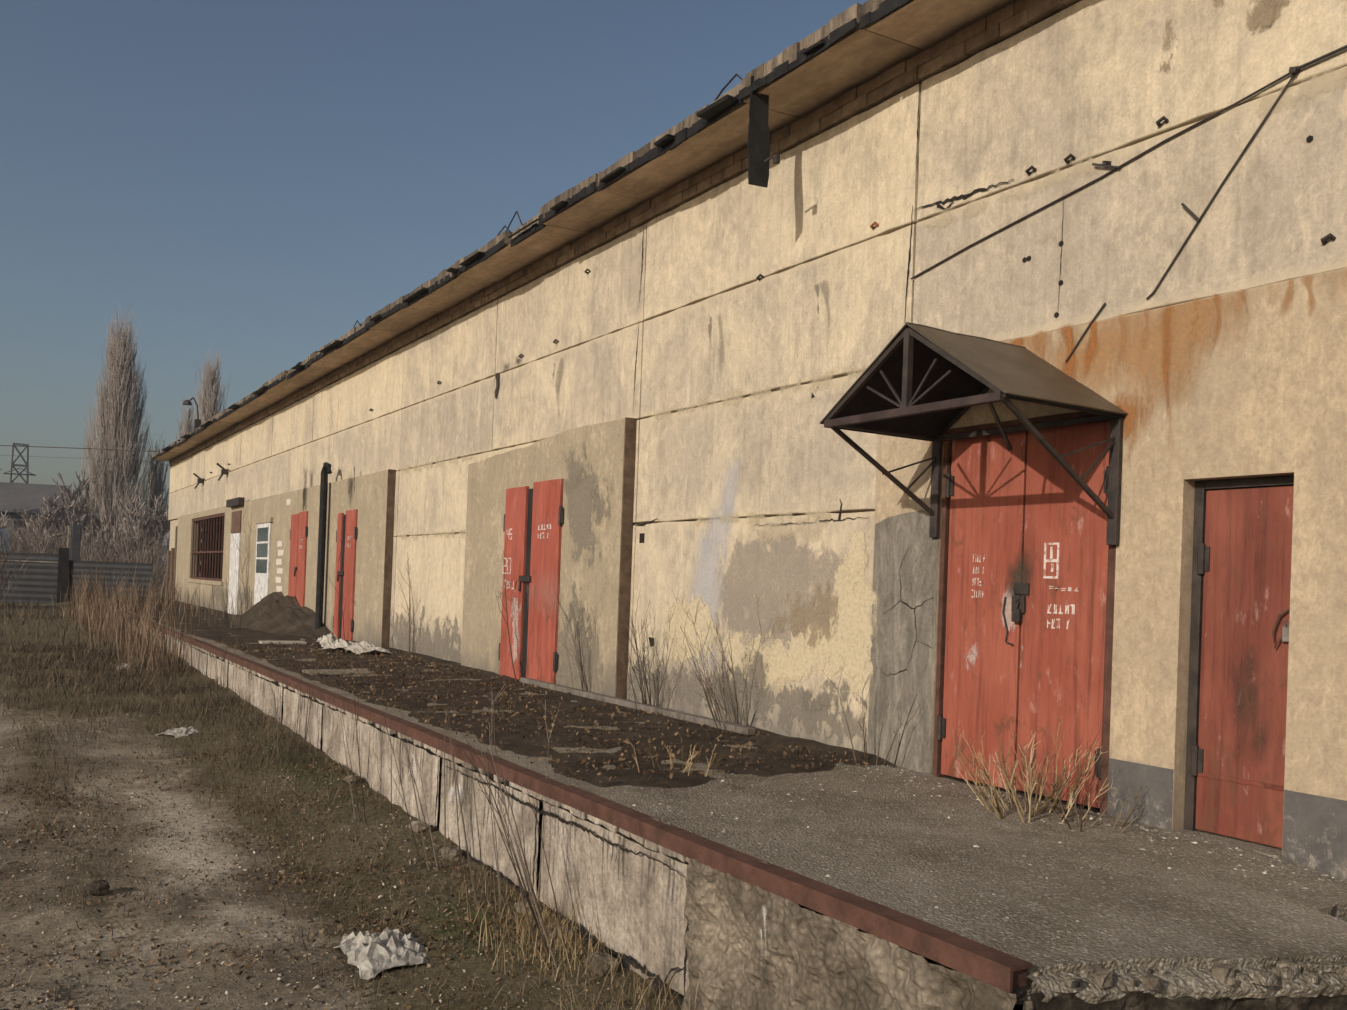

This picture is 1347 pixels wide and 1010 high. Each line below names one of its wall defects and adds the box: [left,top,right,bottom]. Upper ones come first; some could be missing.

corrosion [1285,276,1313,307]
corrosion [1011,293,1244,407]
corrosion [1116,398,1147,437]
crack [874,550,932,676]